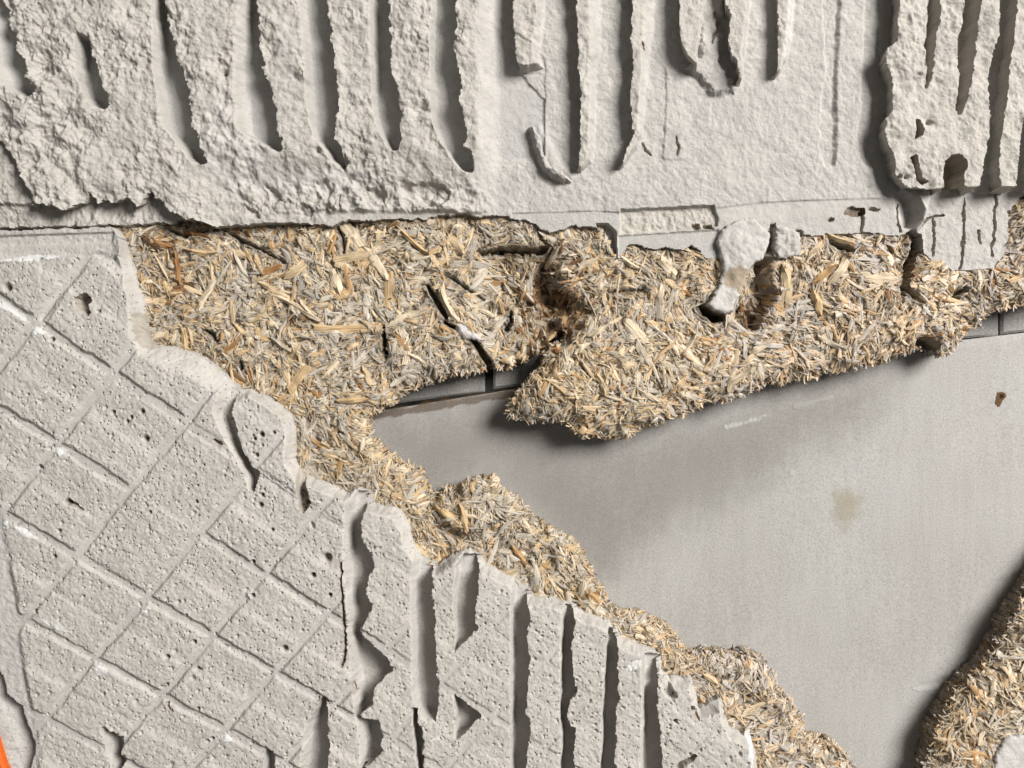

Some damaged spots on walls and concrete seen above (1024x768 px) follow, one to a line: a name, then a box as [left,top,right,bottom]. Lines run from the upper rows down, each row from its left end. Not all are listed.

spalling [456,243,591,367]
peeling [692,218,781,333]
crack [318,561,359,705]